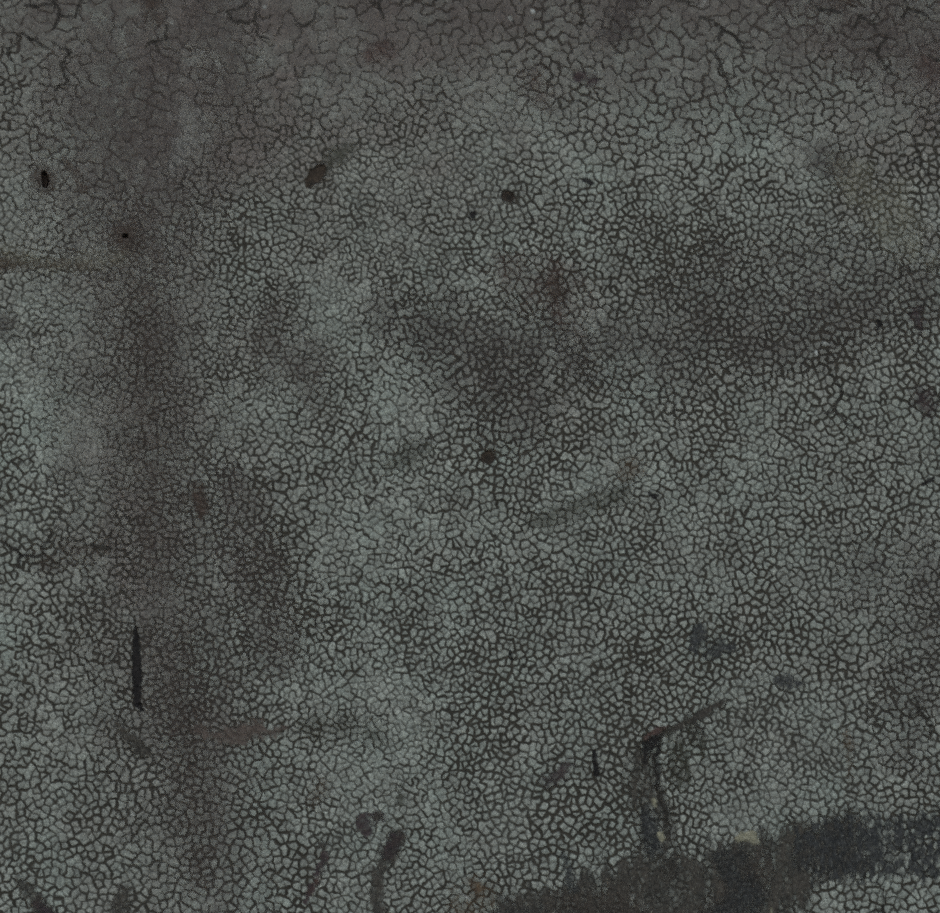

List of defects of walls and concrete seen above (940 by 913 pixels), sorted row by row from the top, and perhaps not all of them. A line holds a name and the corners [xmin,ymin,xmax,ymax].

crack [4,0,82,91]
crack [146,25,168,52]
crack [226,2,270,40]
crack [676,0,755,94]
crack [809,0,929,73]
crack [907,136,937,177]
crack [825,374,859,430]
crack [1,525,58,568]
crack [909,695,933,735]
leakage [794,811,940,885]